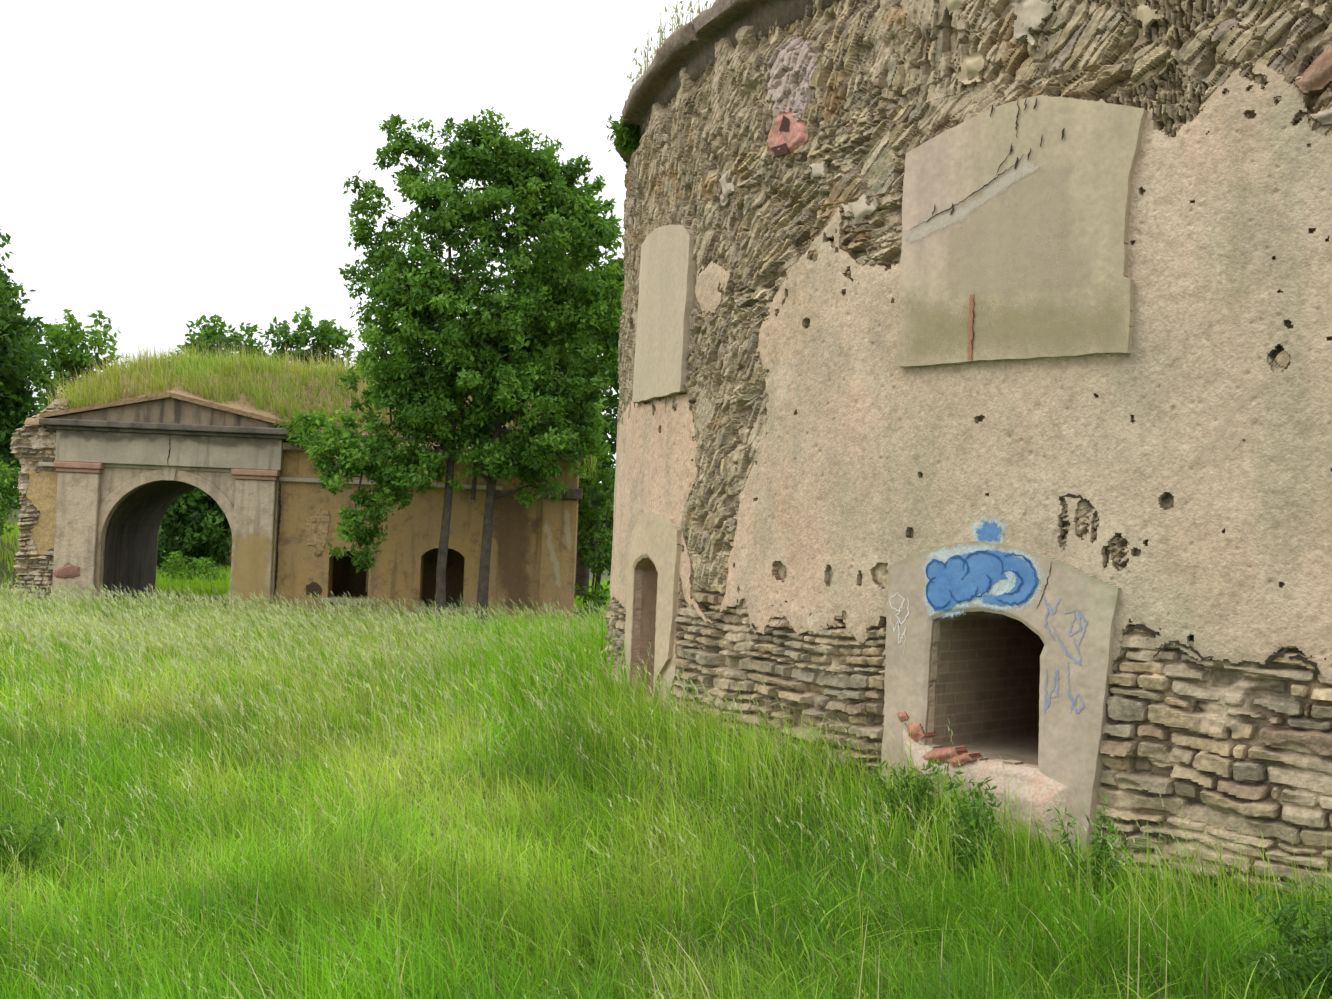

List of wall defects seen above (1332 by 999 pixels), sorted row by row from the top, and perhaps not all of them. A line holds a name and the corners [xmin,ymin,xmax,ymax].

rust [967,294,975,360]
spalling [617,0,1332,779]
spalling [604,599,626,669]
spalling [1094,624,1332,909]